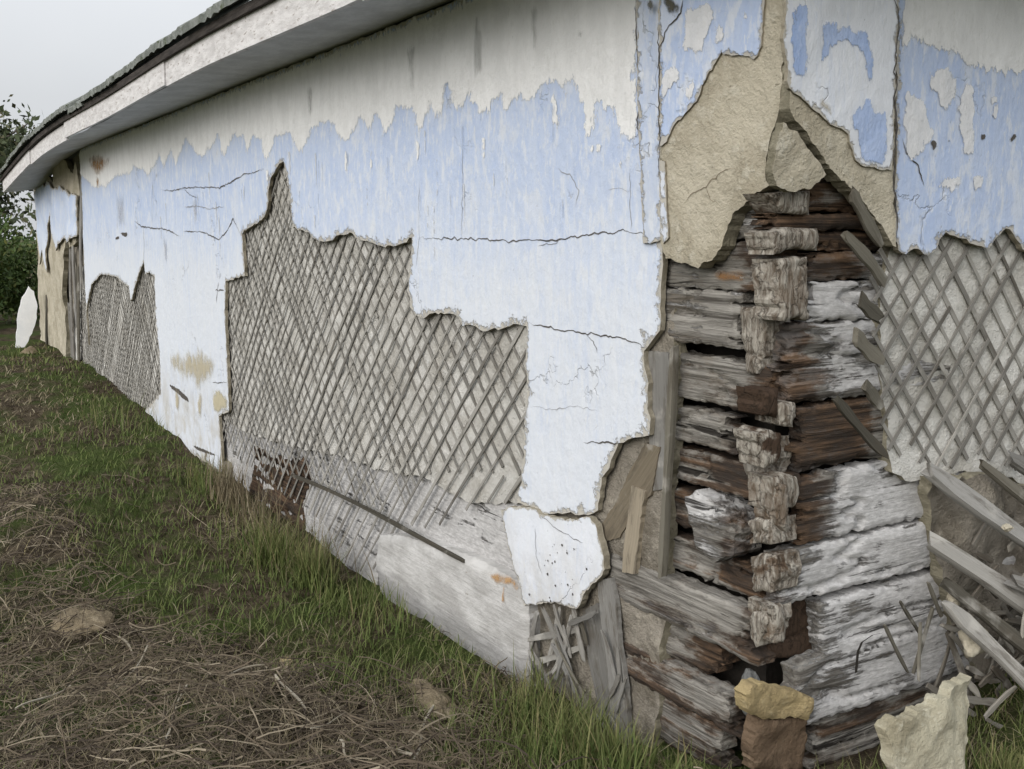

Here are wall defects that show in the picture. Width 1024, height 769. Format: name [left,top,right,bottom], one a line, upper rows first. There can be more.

crack [137,170,259,240]
crack [415,151,642,268]
spalling [34,0,637,572]
crack [534,324,644,349]
spalling [658,0,1024,667]
spalling [528,308,687,749]
spalling [963,652,1007,682]